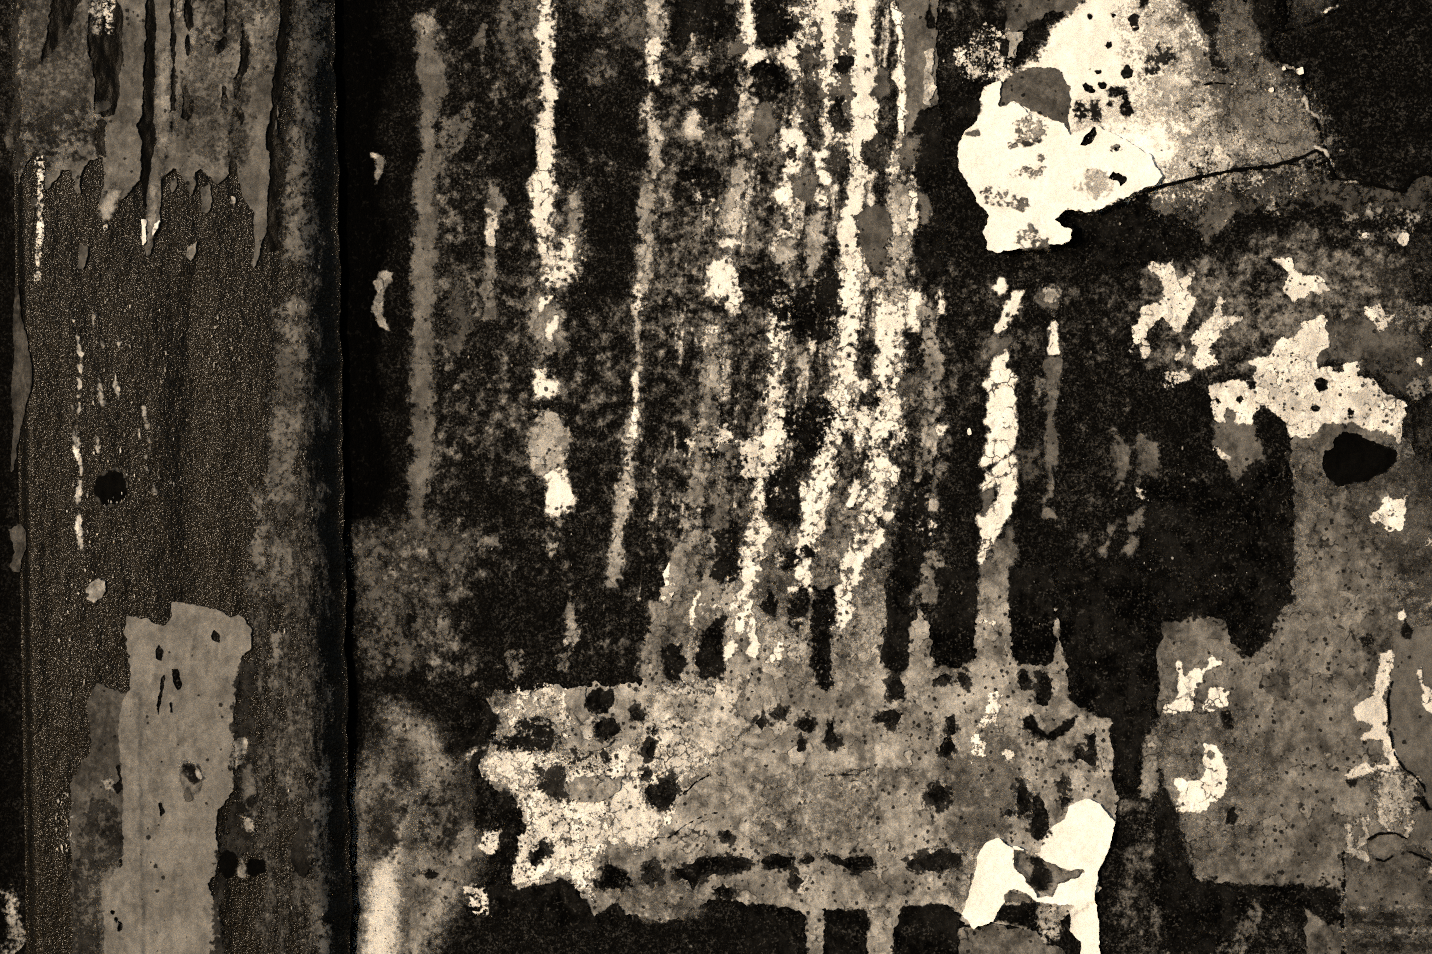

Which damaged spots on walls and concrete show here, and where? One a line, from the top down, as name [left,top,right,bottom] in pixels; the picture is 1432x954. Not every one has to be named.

leakage [137,0,329,266]
leakage [505,50,598,180]
leakage [695,0,813,156]
crack [1145,0,1432,193]
peeling [67,602,265,954]
leakage [602,92,729,589]
leakage [660,528,747,684]
peeling [704,317,722,334]
peeling [470,465,1119,954]
leakage [759,485,840,693]
leakage [701,208,910,524]
peeling [749,0,1432,954]